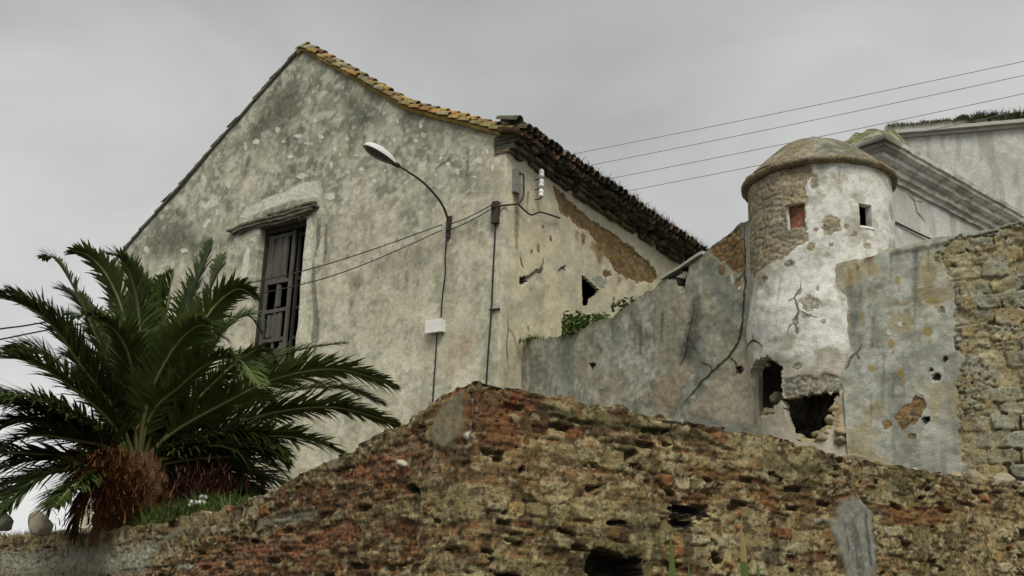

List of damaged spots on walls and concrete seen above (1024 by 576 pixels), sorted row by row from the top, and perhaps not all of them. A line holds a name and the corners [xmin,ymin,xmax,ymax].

flaking render [553,186,657,284]
flaking render [711,165,871,290]
crack [656,227,762,436]
crack [787,280,816,335]
flaking render [929,223,1024,483]
flaking render [688,361,846,446]
flaking render [882,394,930,438]